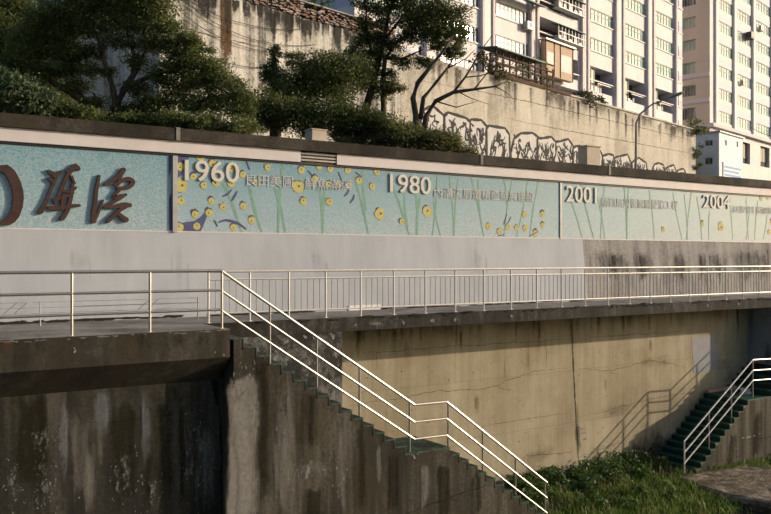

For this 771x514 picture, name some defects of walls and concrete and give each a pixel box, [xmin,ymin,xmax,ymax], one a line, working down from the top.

damp [195,0,359,71]
crack [355,325,700,465]
damp [60,408,94,507]
damp [274,400,326,507]